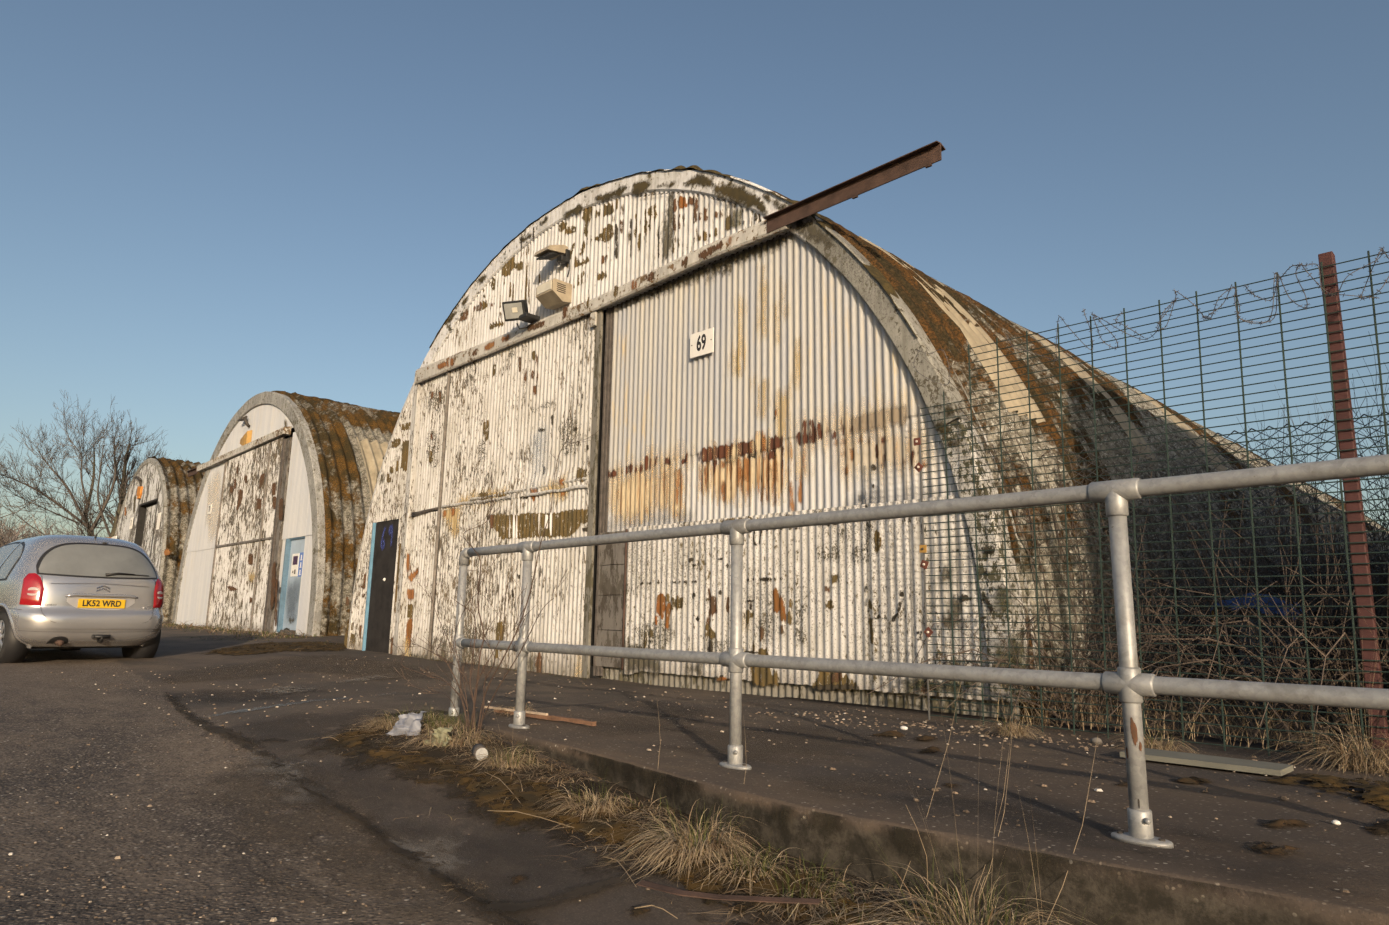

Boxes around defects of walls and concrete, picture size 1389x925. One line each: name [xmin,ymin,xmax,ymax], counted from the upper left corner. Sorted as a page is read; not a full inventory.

peeling [558,196,761,288]
peeling [460,257,540,330]
peeling [428,391,444,411]
peeling [492,350,589,482]
peeling [387,422,411,483]
peeling [427,429,440,467]
peeling [479,420,489,460]
rust [608,382,927,524]
peeling [230,466,281,511]
peeling [487,509,588,539]
peeling [495,621,504,658]